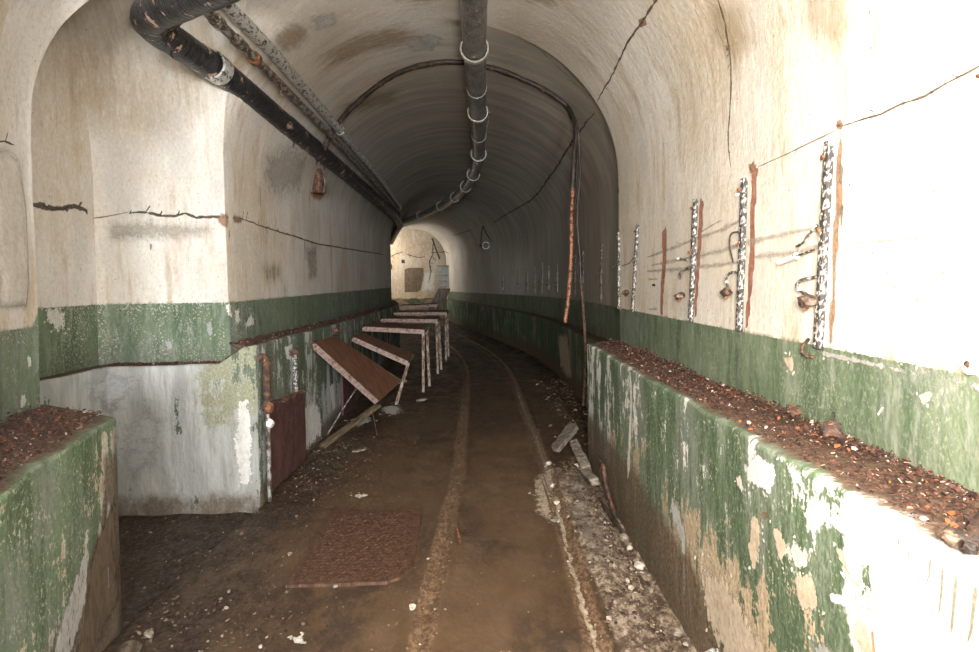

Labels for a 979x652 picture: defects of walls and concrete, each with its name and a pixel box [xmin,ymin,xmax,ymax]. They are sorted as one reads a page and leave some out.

crack [33,0,657,283]
crack [718,1,732,167]
crack [758,65,979,167]
rust [746,162,758,328]
rust [829,120,843,343]
peeling [41,305,70,334]
peeling [783,351,795,376]
peeling [734,451,808,497]
peeling [694,552,768,652]